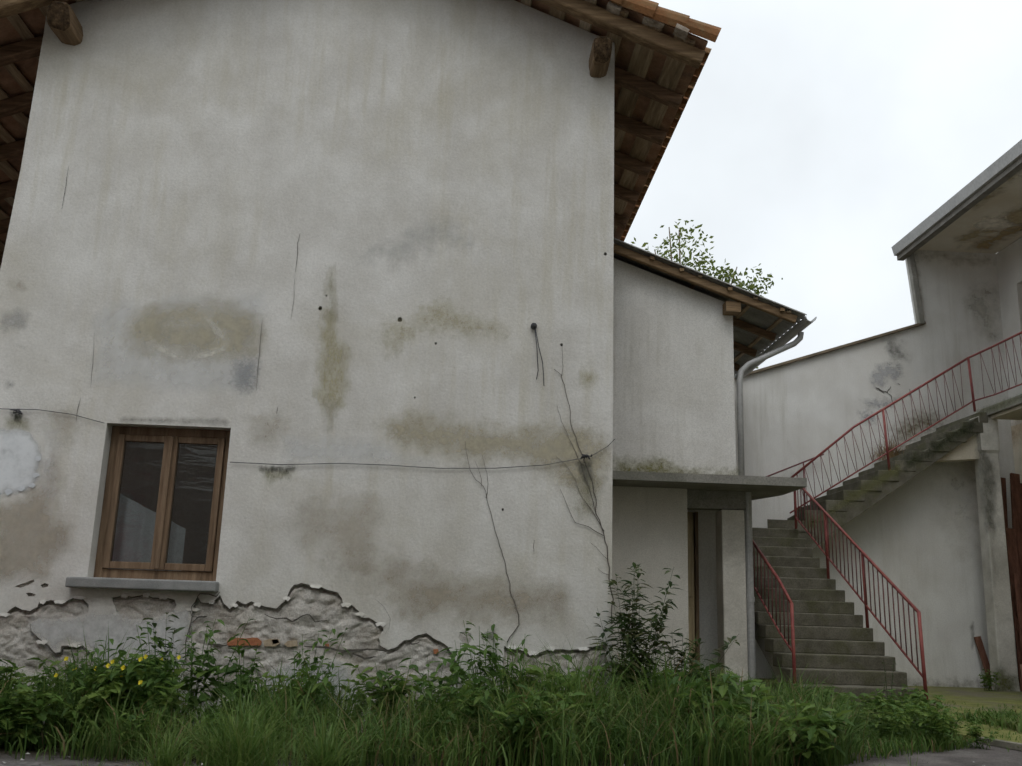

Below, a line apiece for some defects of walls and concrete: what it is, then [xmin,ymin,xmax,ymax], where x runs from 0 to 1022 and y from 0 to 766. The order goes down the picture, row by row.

water stain [961,208,1022,249]
peeling [0,430,41,496]
water stain [393,422,602,490]
spalling [0,580,94,677]
spalling [113,583,459,702]
spalling [495,645,610,696]